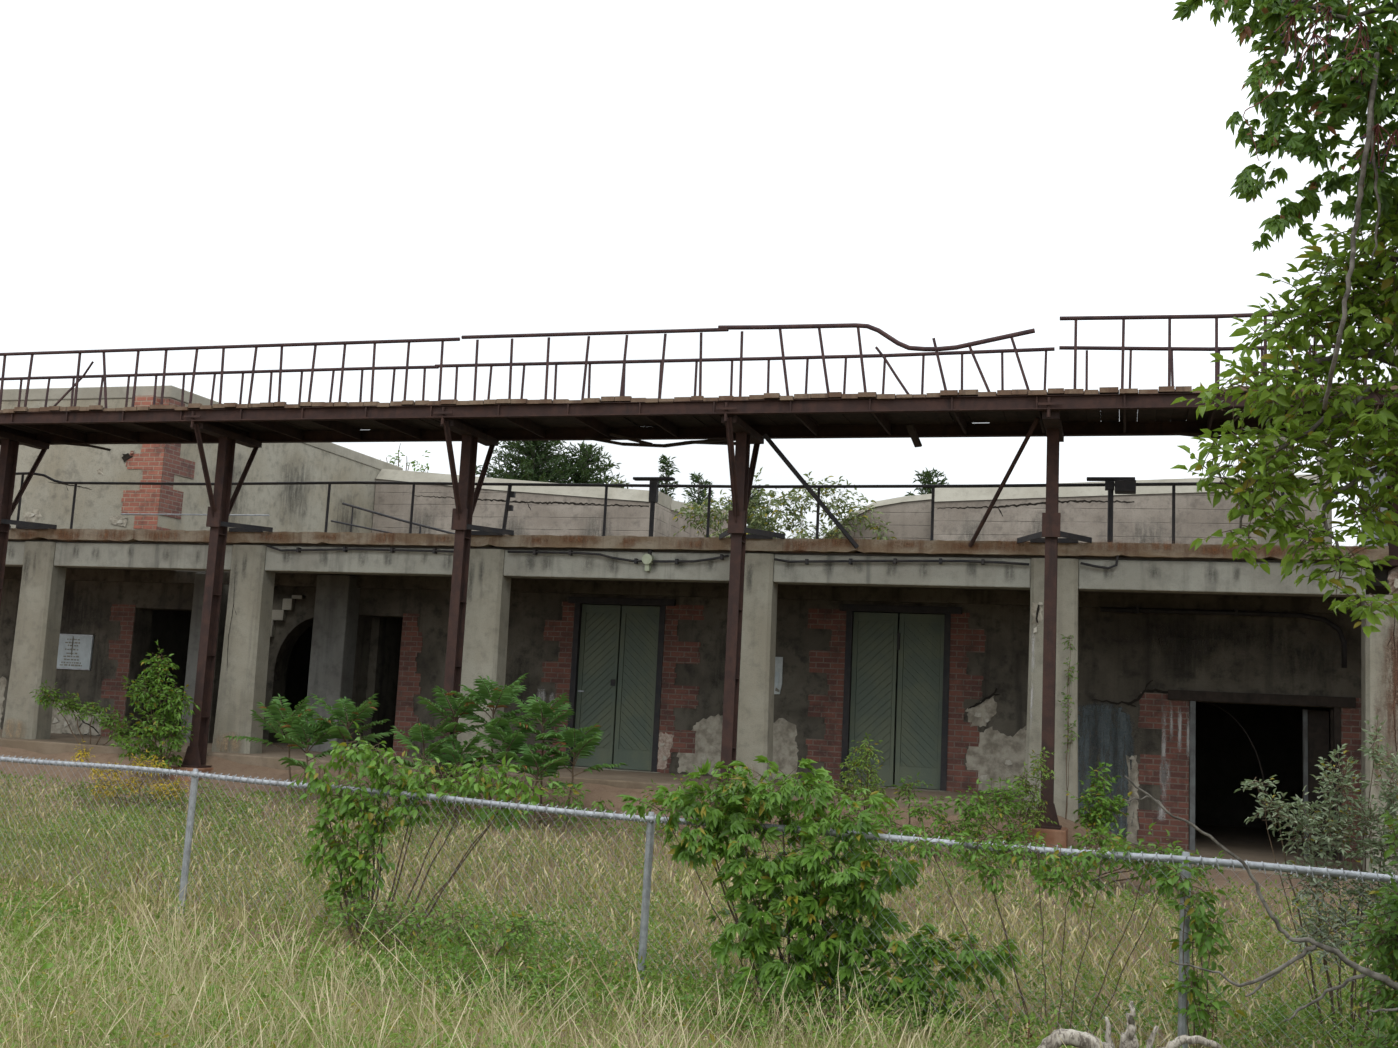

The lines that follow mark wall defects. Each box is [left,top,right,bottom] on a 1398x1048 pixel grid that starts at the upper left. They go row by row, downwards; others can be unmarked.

spalling [657,714,723,775]
spalling [965,696,1026,792]
rust [1375,636,1398,775]